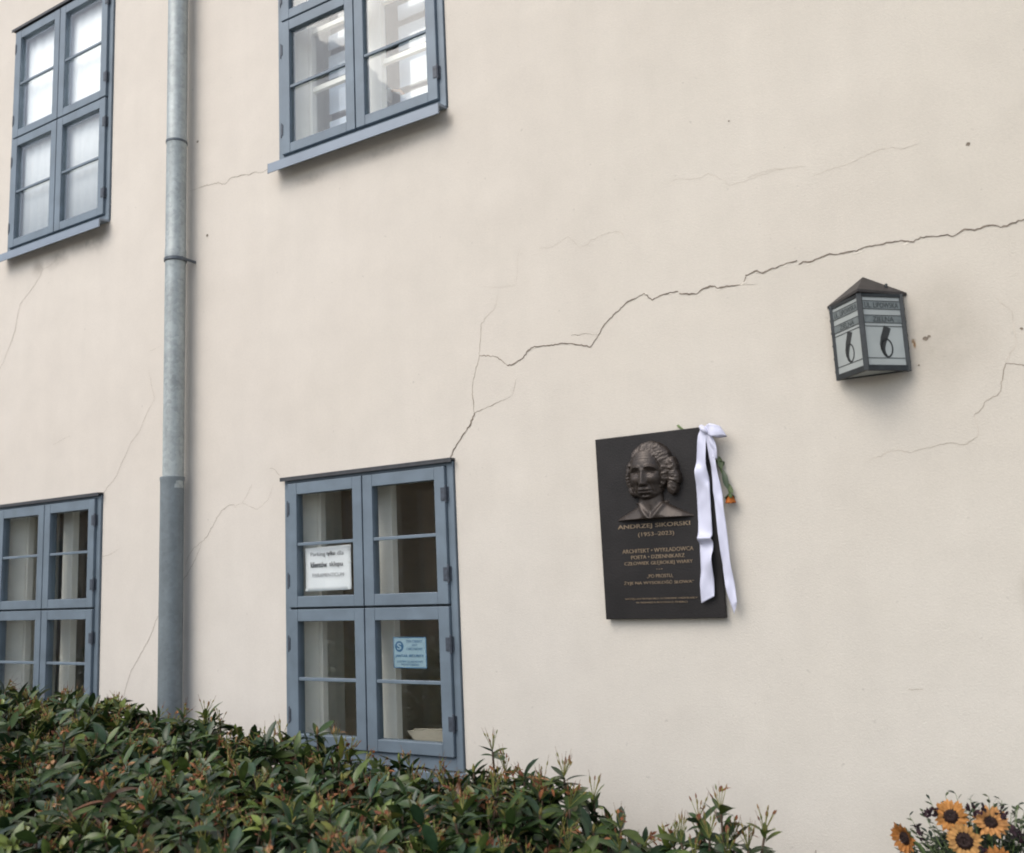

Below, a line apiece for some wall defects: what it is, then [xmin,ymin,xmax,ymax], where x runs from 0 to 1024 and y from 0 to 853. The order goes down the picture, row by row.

crack [450,219,1024,463]